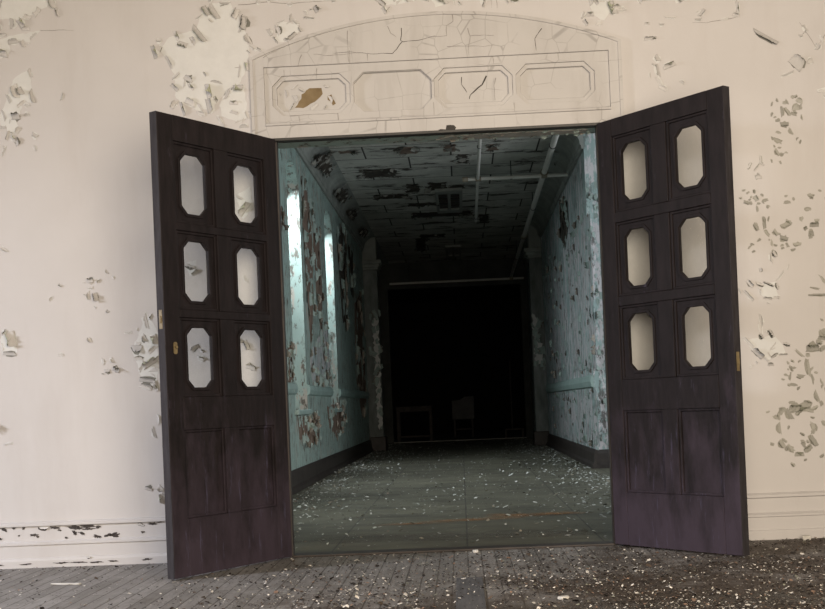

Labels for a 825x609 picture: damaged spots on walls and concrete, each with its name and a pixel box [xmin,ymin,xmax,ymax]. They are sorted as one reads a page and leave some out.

peeling [150,0,262,128]
peeling [279,83,336,110]
crack [298,14,496,99]
crack [694,0,740,23]
peeling [753,28,778,45]
peeling [281,206,290,231]
peeling [739,94,822,263]
peeling [531,179,605,381]
peeling [124,311,160,391]
peeling [552,386,609,450]
peeling [743,314,825,467]
spalling [0,525,120,540]